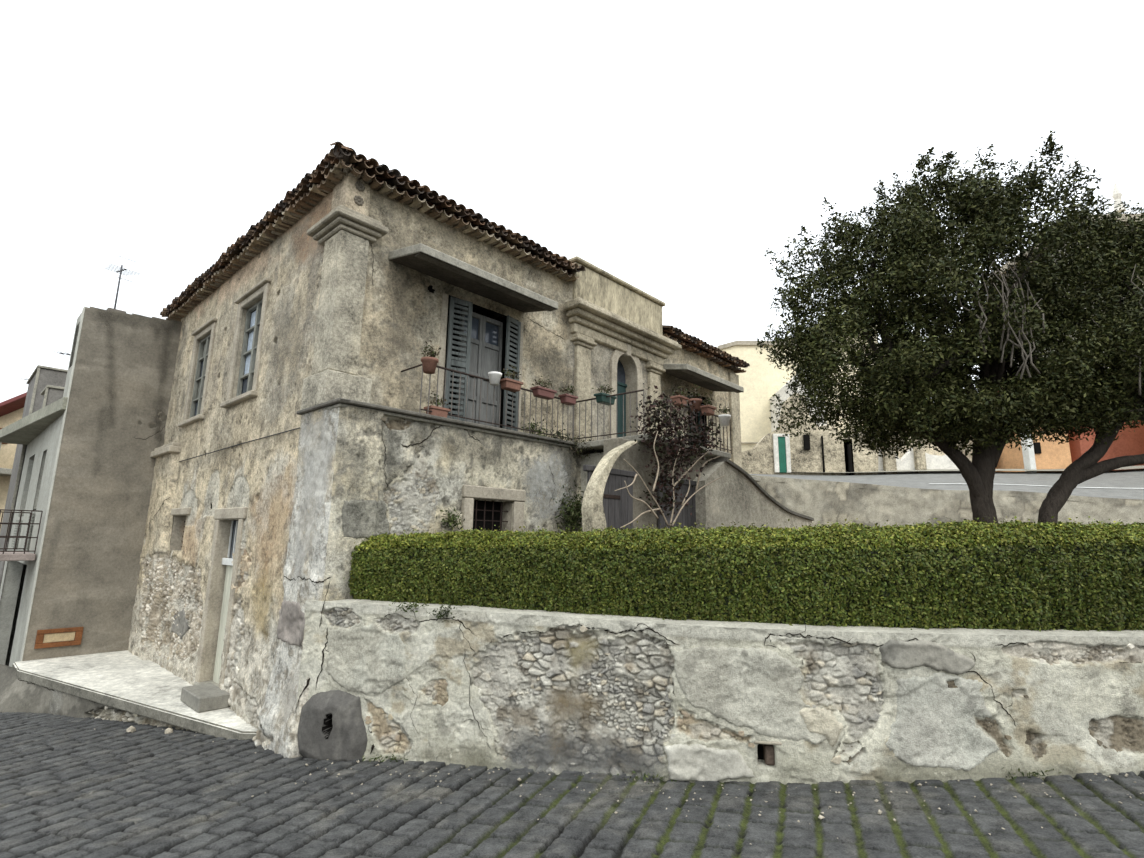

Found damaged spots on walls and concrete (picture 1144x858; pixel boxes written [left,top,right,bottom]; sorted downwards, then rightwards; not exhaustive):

spalling [138,551,203,664]
crack [284,576,332,714]
spalling [362,698,413,758]
spalling [470,624,755,778]
spalling [759,635,885,765]
spalling [1088,714,1144,757]